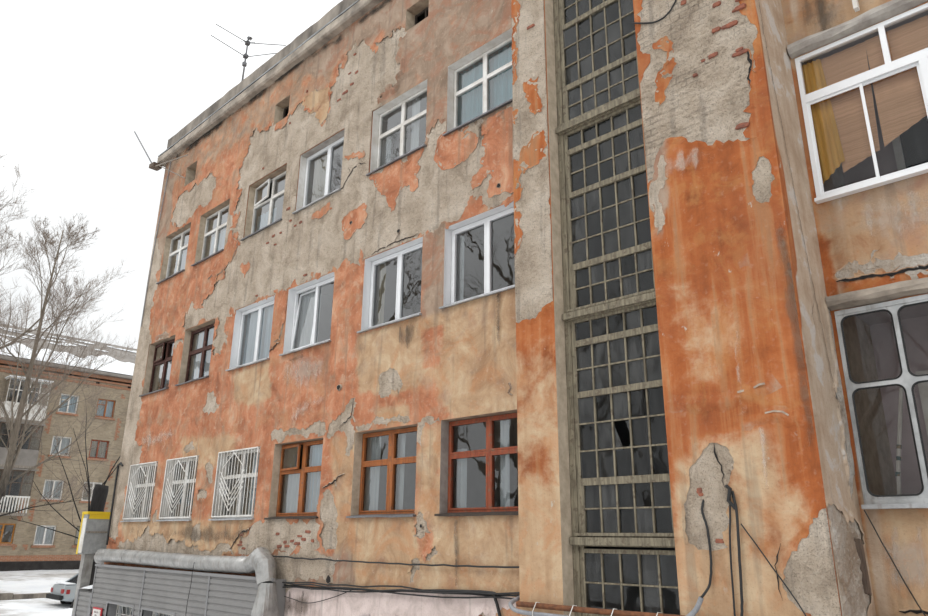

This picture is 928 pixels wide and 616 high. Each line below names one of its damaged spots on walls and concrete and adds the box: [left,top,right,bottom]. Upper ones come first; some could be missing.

spalling [109,0,553,594]
spalling [636,0,780,235]
crack [746,4,843,411]
crack [836,264,928,282]
spalling [679,437,741,558]
crack [714,445,726,490]
crack [774,543,782,597]
spalling [774,294,873,616]